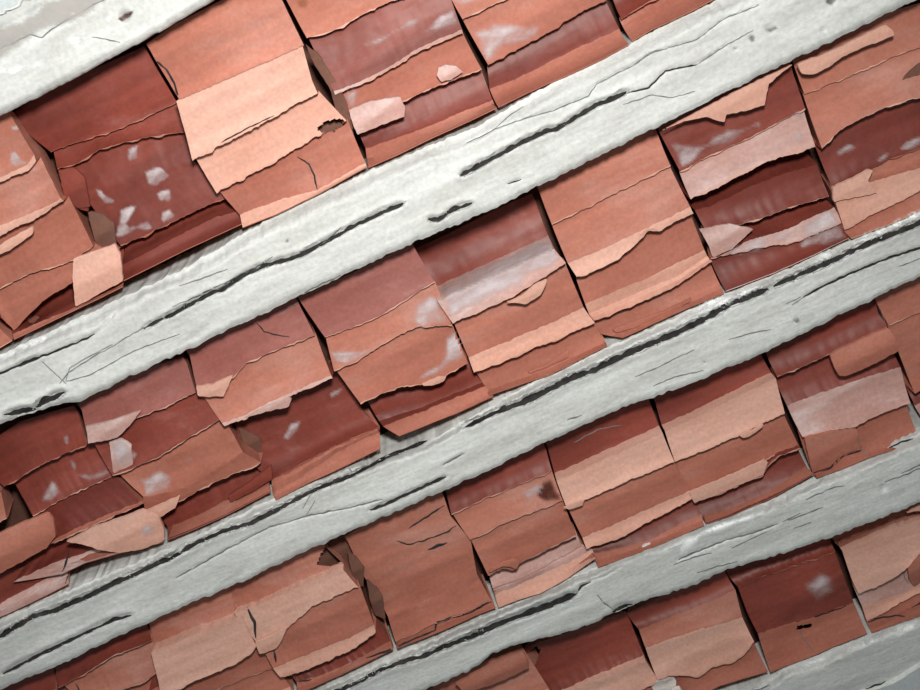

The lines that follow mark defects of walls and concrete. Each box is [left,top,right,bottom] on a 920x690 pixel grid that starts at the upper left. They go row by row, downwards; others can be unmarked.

crack [460,5,758,176]
peeling [663,24,894,130]
peeling [0,226,34,254]
peeling [72,207,134,306]
crack [0,203,403,415]
crack [465,220,920,427]
spalling [629,285,759,346]
peeling [67,495,180,553]
crack [0,440,464,638]
peeling [689,459,768,503]
crack [3,615,132,674]
crack [335,581,632,690]